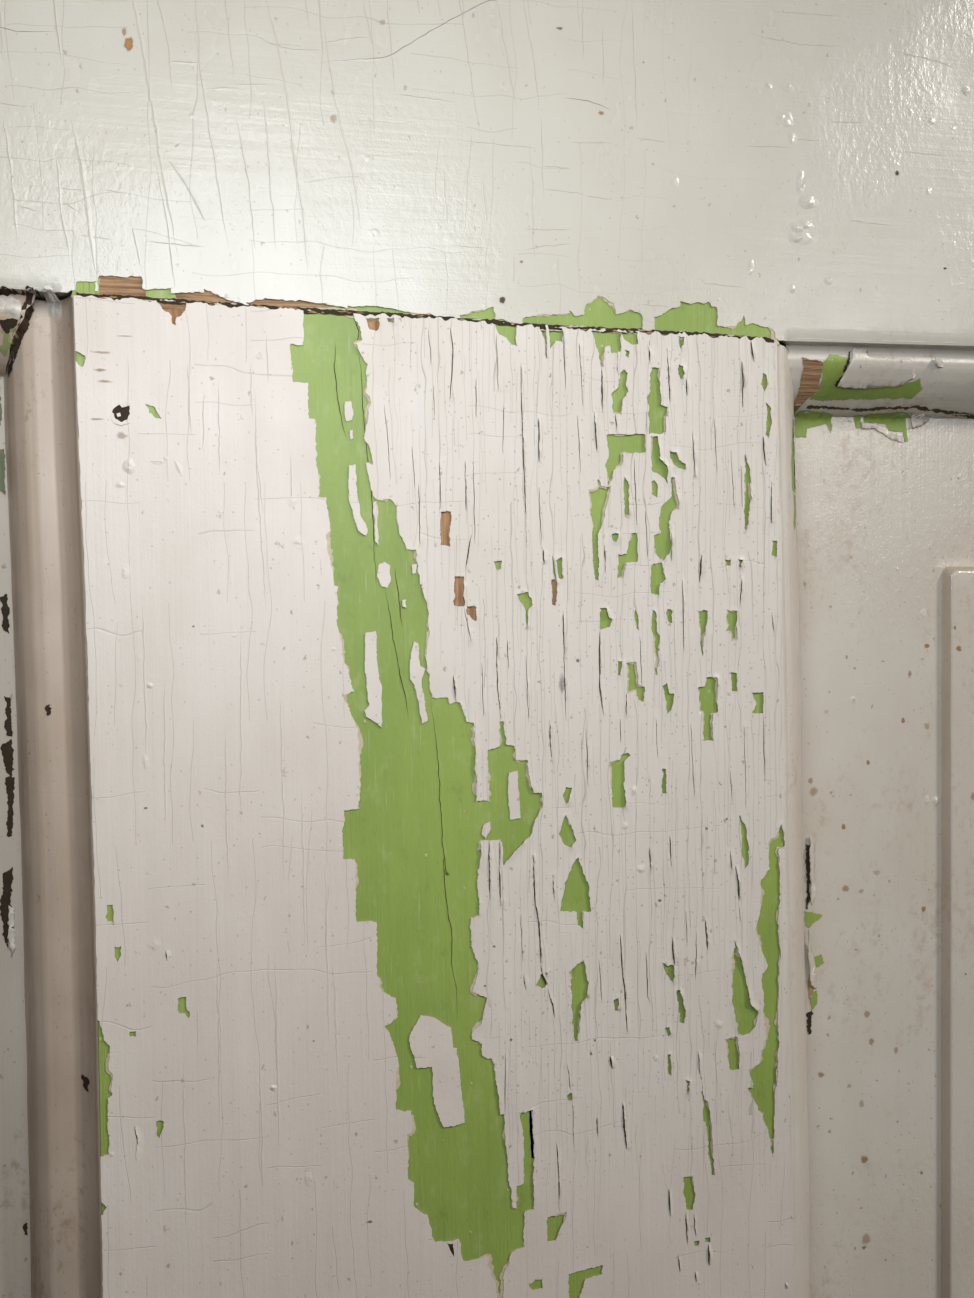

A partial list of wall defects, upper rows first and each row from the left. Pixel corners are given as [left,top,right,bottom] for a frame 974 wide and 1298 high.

peeling [460,296,780,418]
peeling [792,348,929,528]
crack [0,0,774,1076]
peeling [588,367,686,714]
crack [81,1074,89,1092]
peeling [71,276,543,1298]
peeling [559,787,591,928]
crack [529,1067,630,1210]
crack [599,855,744,1069]
peeling [725,826,784,1153]
crack [804,845,812,909]
crack [805,1011,813,1035]